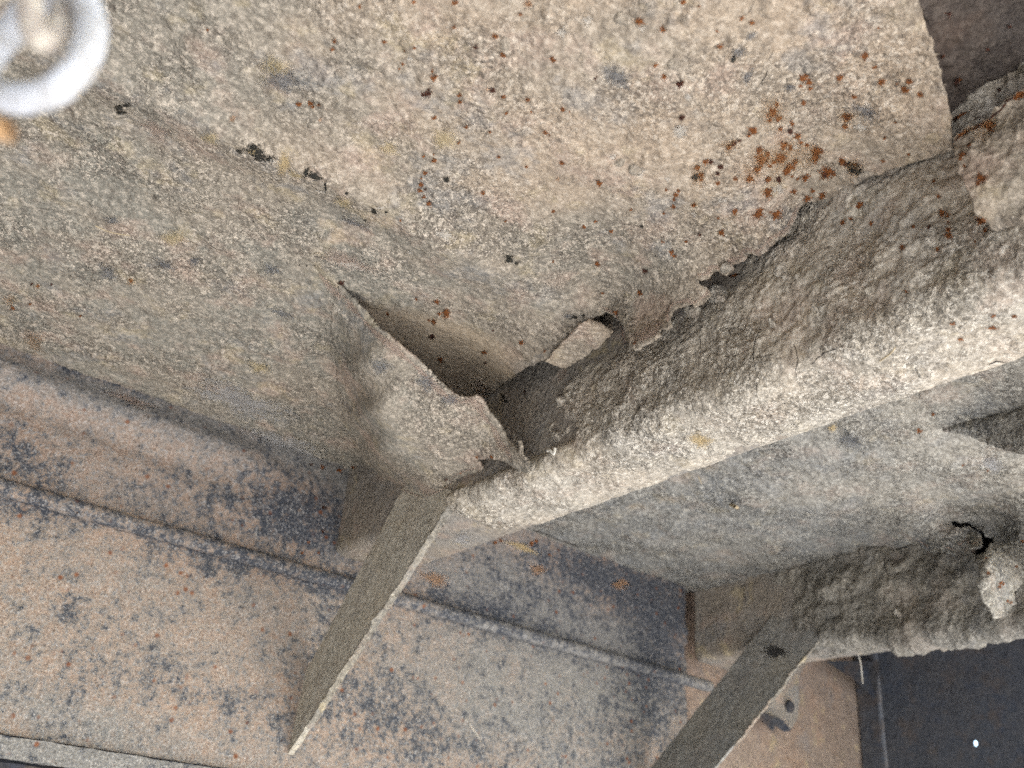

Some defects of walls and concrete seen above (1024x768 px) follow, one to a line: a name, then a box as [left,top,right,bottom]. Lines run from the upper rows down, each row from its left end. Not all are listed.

corrosion [798,73,813,106]
corrosion [862,52,923,98]
corrosion [417,154,437,208]
corrosion [692,159,724,185]
corrosion [727,102,861,221]
corrosion [936,195,953,252]